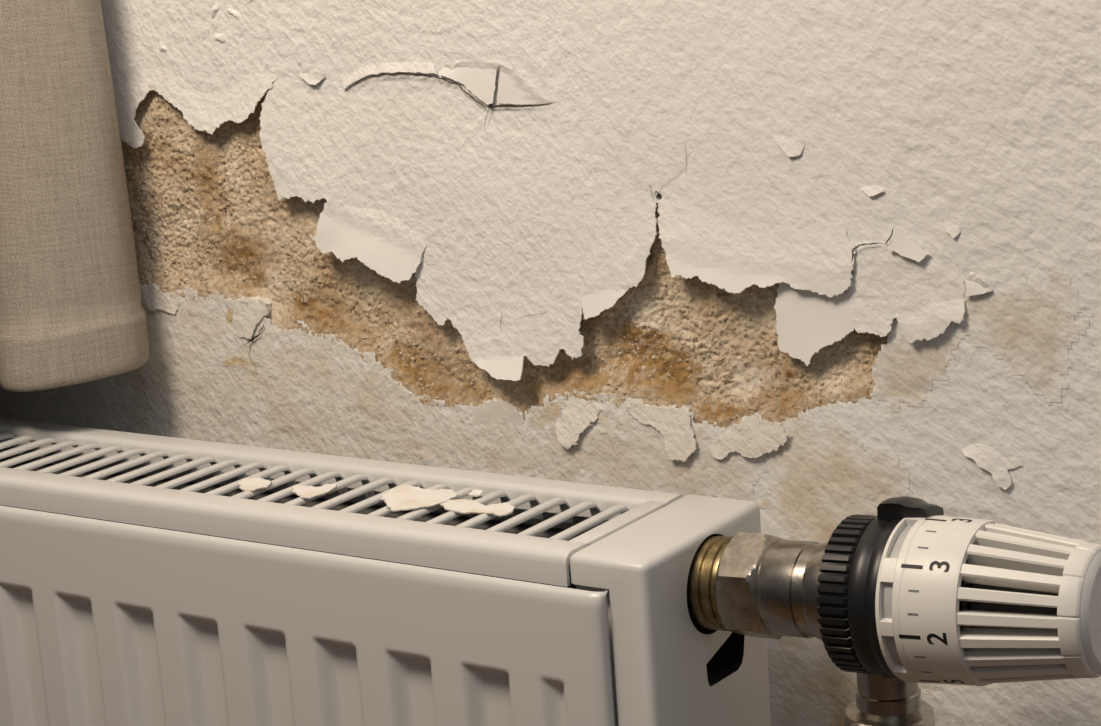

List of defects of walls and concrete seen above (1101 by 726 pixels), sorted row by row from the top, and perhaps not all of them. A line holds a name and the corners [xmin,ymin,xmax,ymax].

crack [341,66,543,130]
damp [126,174,157,283]
peeling [114,56,992,462]
damp [113,284,916,544]
peeling [962,444,1023,490]
damp [767,636,857,726]
damp [919,683,942,722]